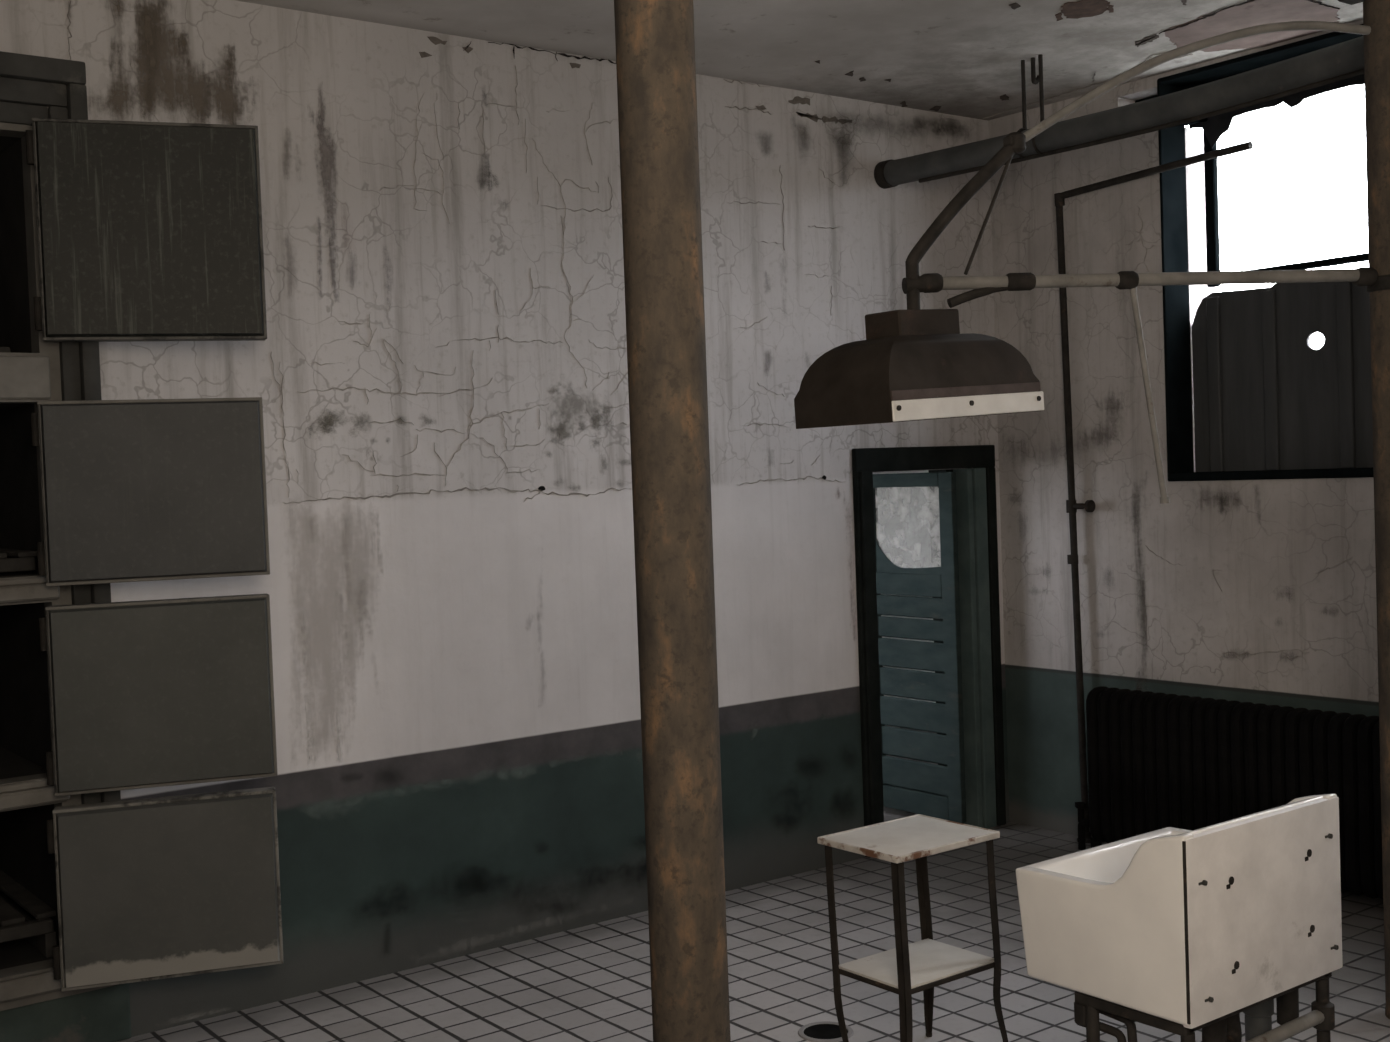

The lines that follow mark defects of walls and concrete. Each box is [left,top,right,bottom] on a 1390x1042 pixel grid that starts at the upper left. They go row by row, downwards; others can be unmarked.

leakage [106,0,242,125]
peeling [1055,0,1114,21]
flaking render [1135,0,1340,52]
leakage [317,93,336,293]
crack [271,42,629,504]
crack [731,165,837,312]
crack [740,455,839,485]